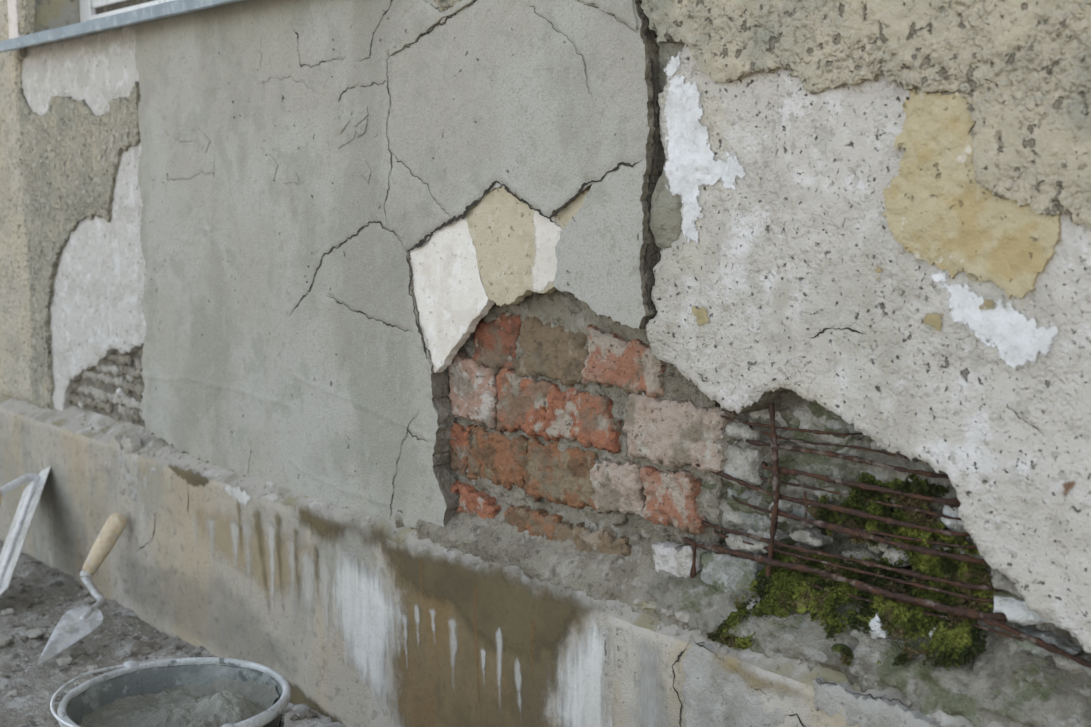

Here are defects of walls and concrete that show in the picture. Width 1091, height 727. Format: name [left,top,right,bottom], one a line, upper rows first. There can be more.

peeling [21,60,138,112]
peeling [53,148,152,355]
crack [260,0,658,370]
peeling [883,87,1061,299]
water stain [79,678,341,727]
water stain [194,485,619,727]
crack [390,419,424,513]
flaking render [395,186,768,630]
crack [672,640,805,727]
crack [815,678,918,711]
corrosion [683,403,1091,668]